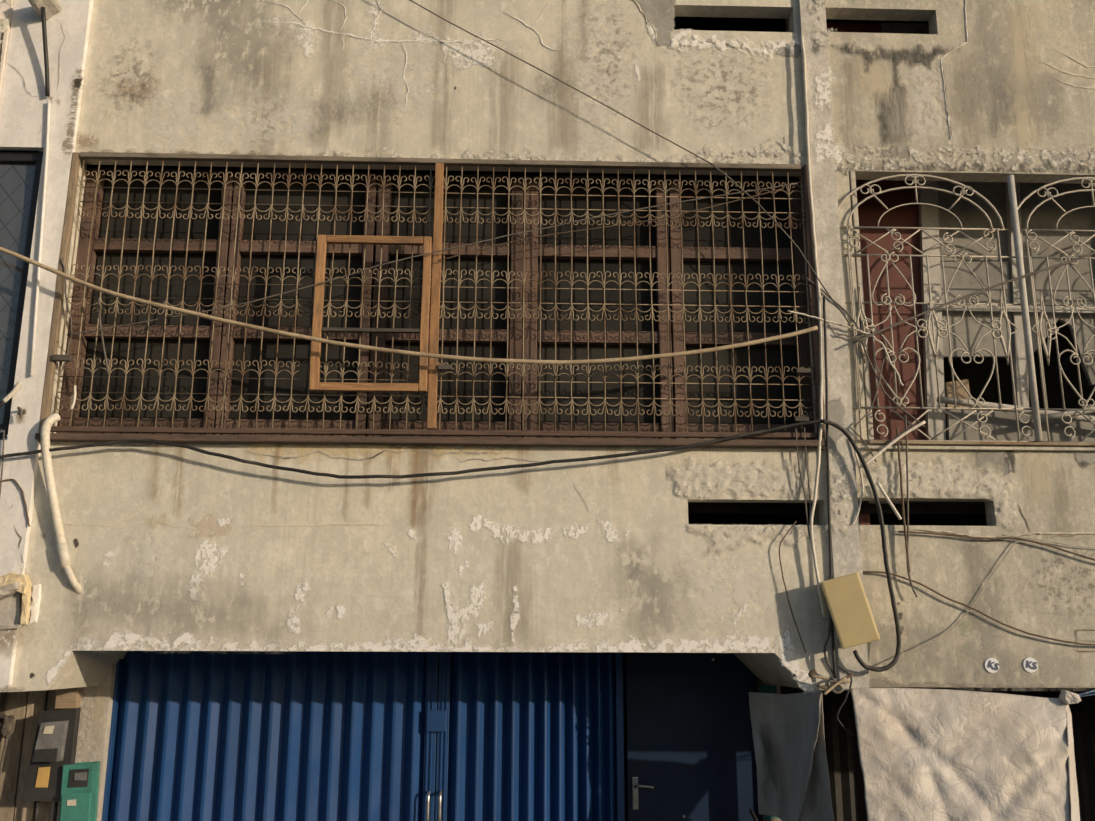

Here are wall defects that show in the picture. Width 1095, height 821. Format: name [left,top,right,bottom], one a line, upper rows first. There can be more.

peeling [0,0,14,43]
damp [219,24,266,80]
crack [252,0,562,106]
peeling [814,68,834,108]
damp [840,44,946,145]
damp [965,9,1059,146]
spalling [428,147,586,161]
peeling [598,122,1095,175]
peeling [447,528,470,576]
peeling [490,524,588,545]
spalling [0,572,41,630]
peeling [30,582,815,692]